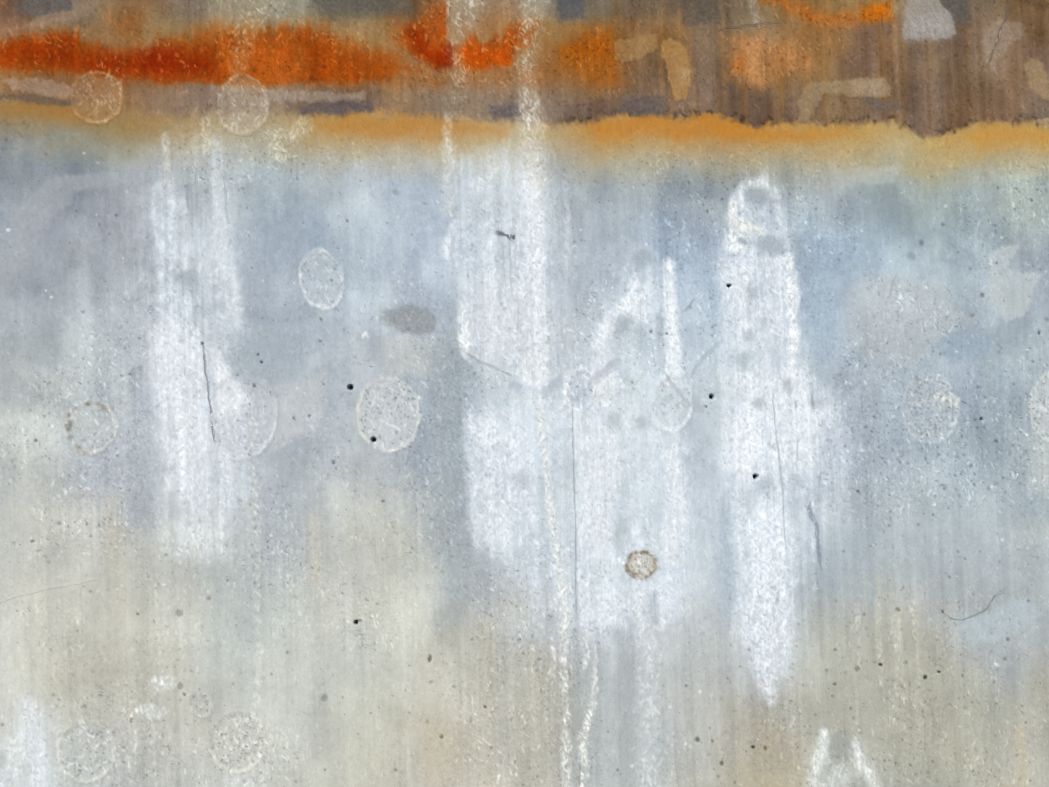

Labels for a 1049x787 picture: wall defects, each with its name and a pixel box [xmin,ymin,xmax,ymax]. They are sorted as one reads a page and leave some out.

water stain [0,0,71,30]
water stain [0,79,72,112]
corrosion [0,0,239,92]
water stain [148,0,422,75]
corrosion [247,0,447,95]
corrosion [464,11,518,77]
corrosion [541,14,635,107]
corrosion [719,0,900,99]
corrosion [0,106,517,187]
corrosion [546,117,1049,198]
water stain [109,86,266,725]
water stain [260,0,1049,787]